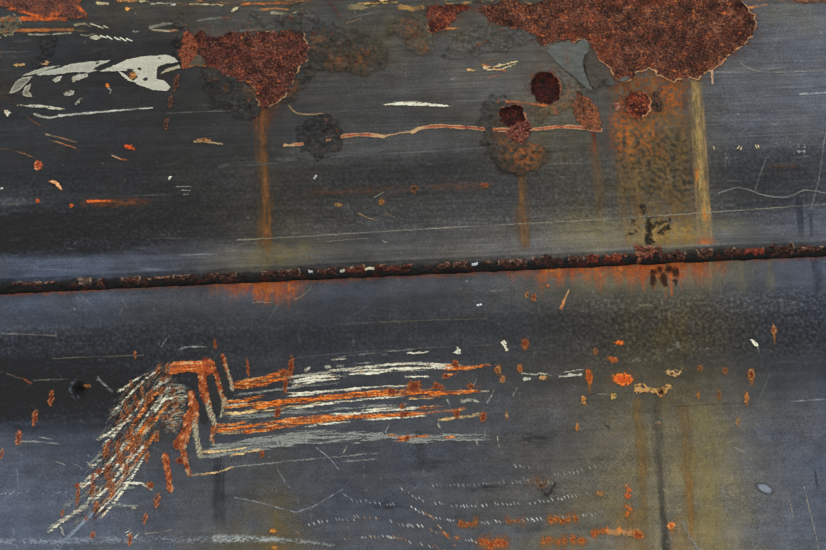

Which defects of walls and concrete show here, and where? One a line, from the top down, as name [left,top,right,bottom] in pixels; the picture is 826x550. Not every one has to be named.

peeling [9,77,63,110]
peeling [63,74,88,105]
rust [168,30,311,249]
rust [341,90,602,154]
peeling [546,38,629,91]
rust [426,0,761,231]
rust [481,216,720,279]
rust [724,242,824,258]
rust [218,355,484,434]
rust [74,363,178,521]
rust [478,537,508,550]
rust [541,527,644,546]